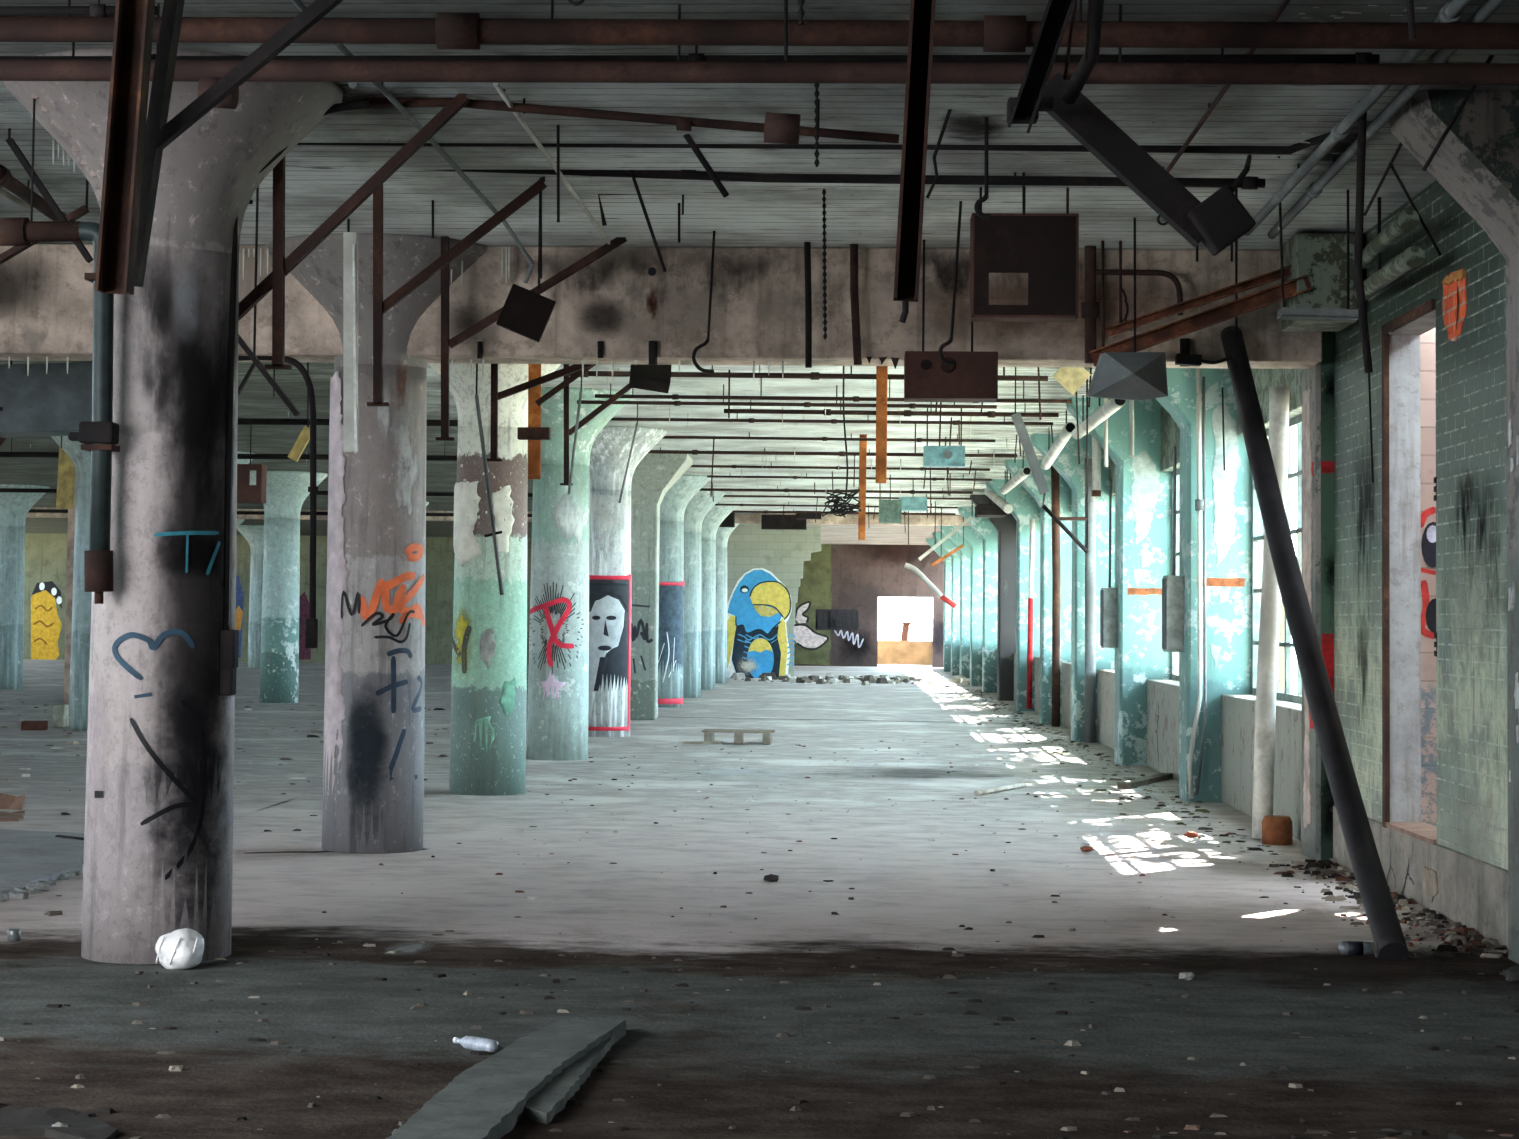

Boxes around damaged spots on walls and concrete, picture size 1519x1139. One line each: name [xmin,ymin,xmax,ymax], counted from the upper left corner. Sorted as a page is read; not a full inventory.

peeling [453,458,524,567]
peeling [1131,450,1163,568]
peeling [1212,403,1241,566]